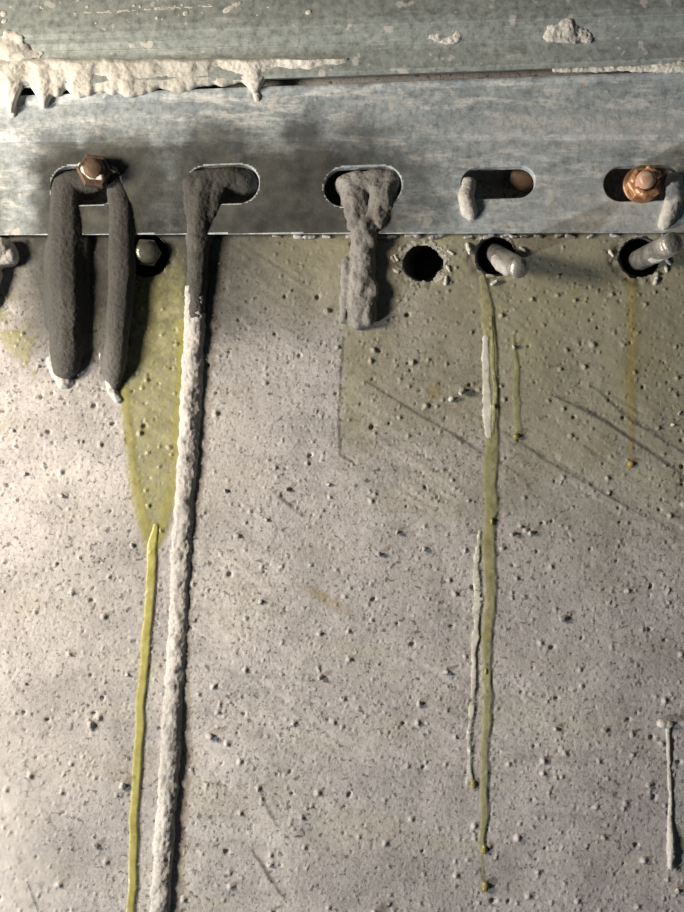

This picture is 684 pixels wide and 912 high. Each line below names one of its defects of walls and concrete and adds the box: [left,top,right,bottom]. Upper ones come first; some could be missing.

water stain [25,235,48,322]
water stain [88,235,109,329]
water stain [205,234,284,323]
water stain [121,235,188,912]
water stain [398,233,684,892]